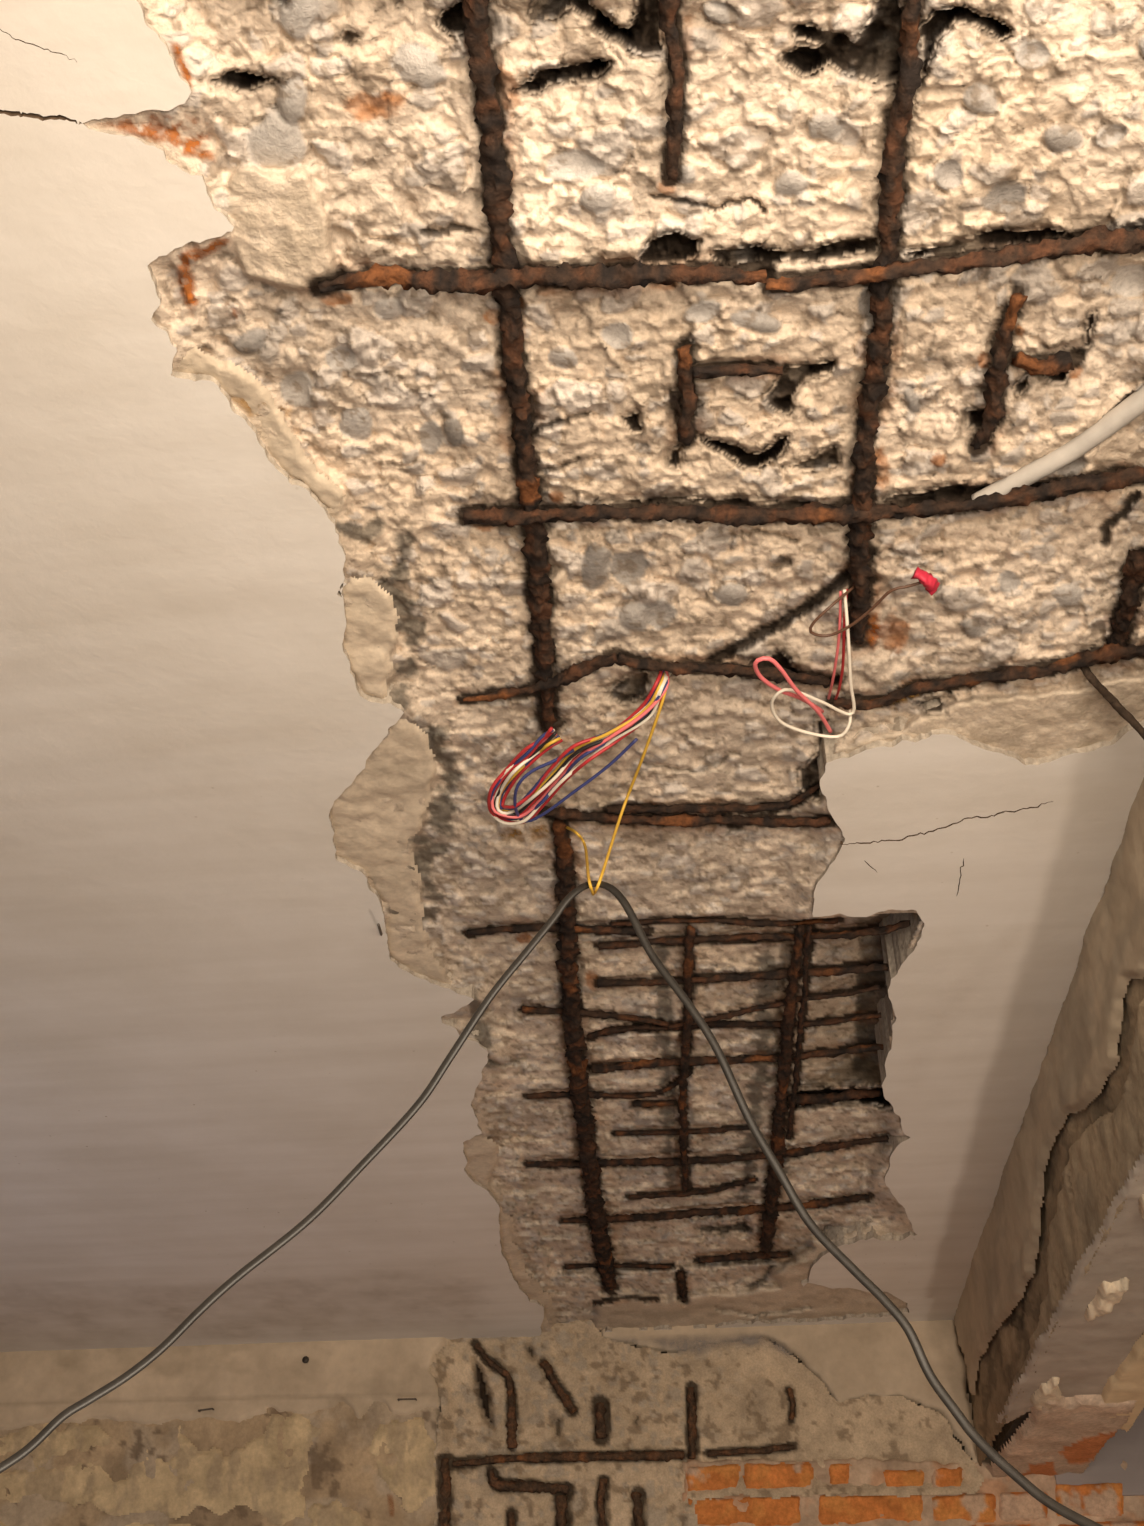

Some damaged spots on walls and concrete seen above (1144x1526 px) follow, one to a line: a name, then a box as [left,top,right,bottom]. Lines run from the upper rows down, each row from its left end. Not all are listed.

crack [0,29,77,62]
rust [174,45,191,85]
crack [0,110,77,124]
rust [119,116,210,157]
spalling [77,0,1144,1241]
peeling [954,778,1144,1424]
spalling [369,887,1079,1526]
peeling [0,1413,367,1526]
flaking render [1025,1474,1144,1526]